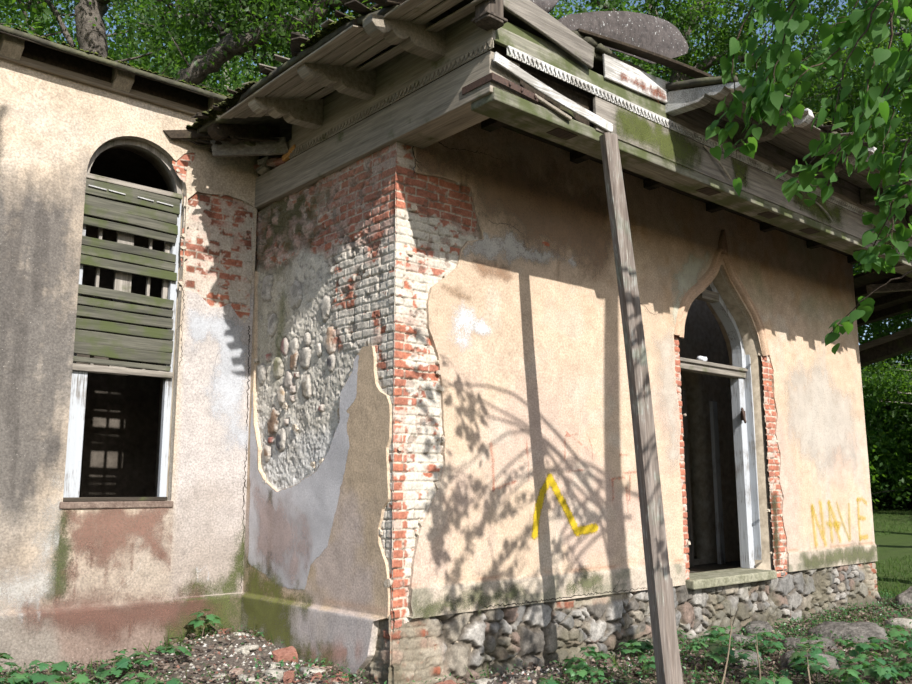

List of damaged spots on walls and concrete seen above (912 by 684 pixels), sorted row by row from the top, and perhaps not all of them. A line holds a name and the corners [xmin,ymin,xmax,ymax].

spalling [172,153,195,182]
spalling [178,142,576,684]
spalling [659,335,691,580]
spalling [758,353,787,577]
water stain [0,503,72,602]
water stain [166,539,340,672]
water stain [416,585,522,617]
water stain [567,569,603,593]